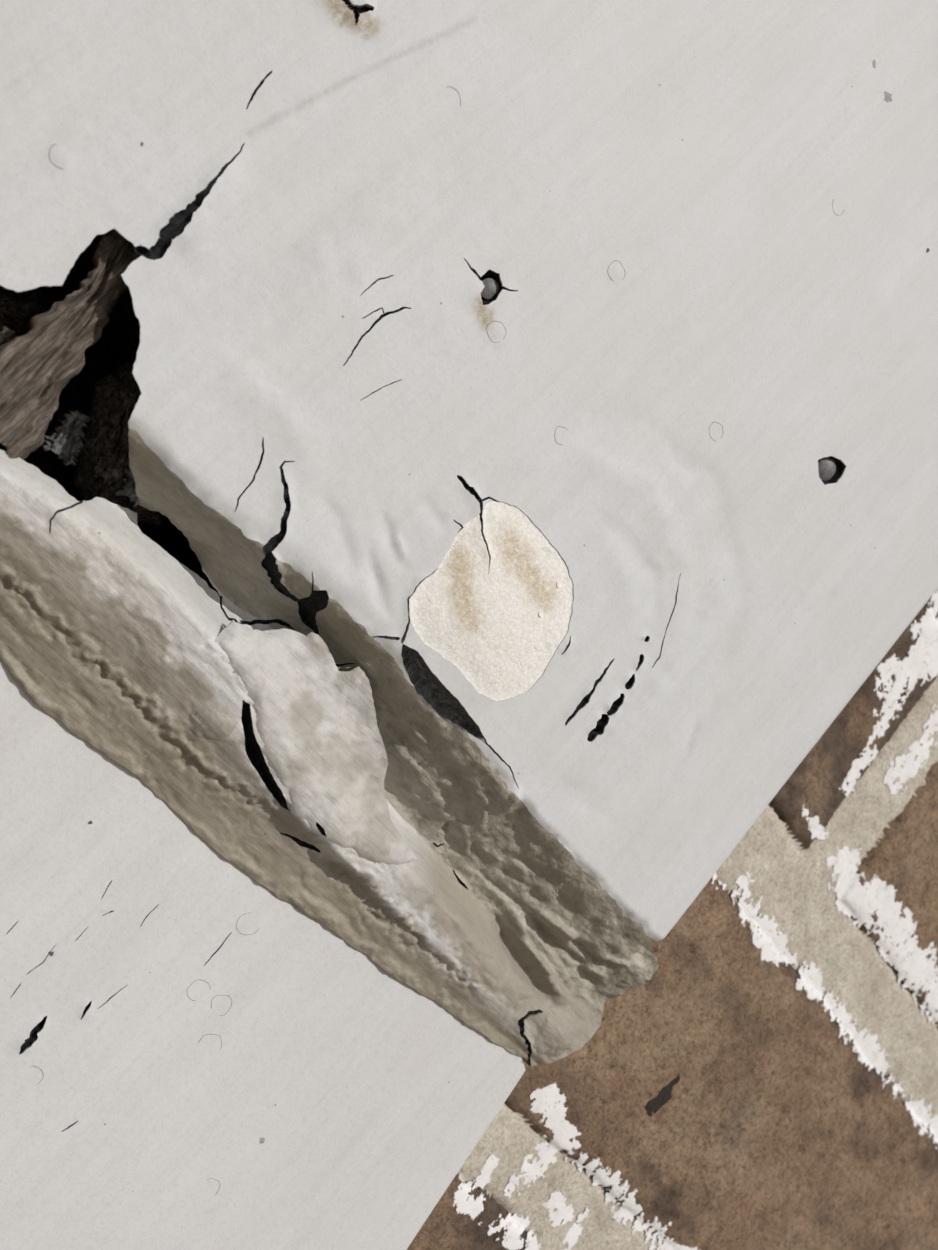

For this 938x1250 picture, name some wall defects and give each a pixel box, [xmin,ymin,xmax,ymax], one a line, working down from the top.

crack [246,71,272,110]
spalling [25,233,108,304]
crack [134,143,245,260]
spalling [24,289,140,501]
spalling [137,514,220,597]
crack [220,439,329,635]
peeling [409,501,573,701]
crack [565,586,678,741]
crack [241,700,326,853]